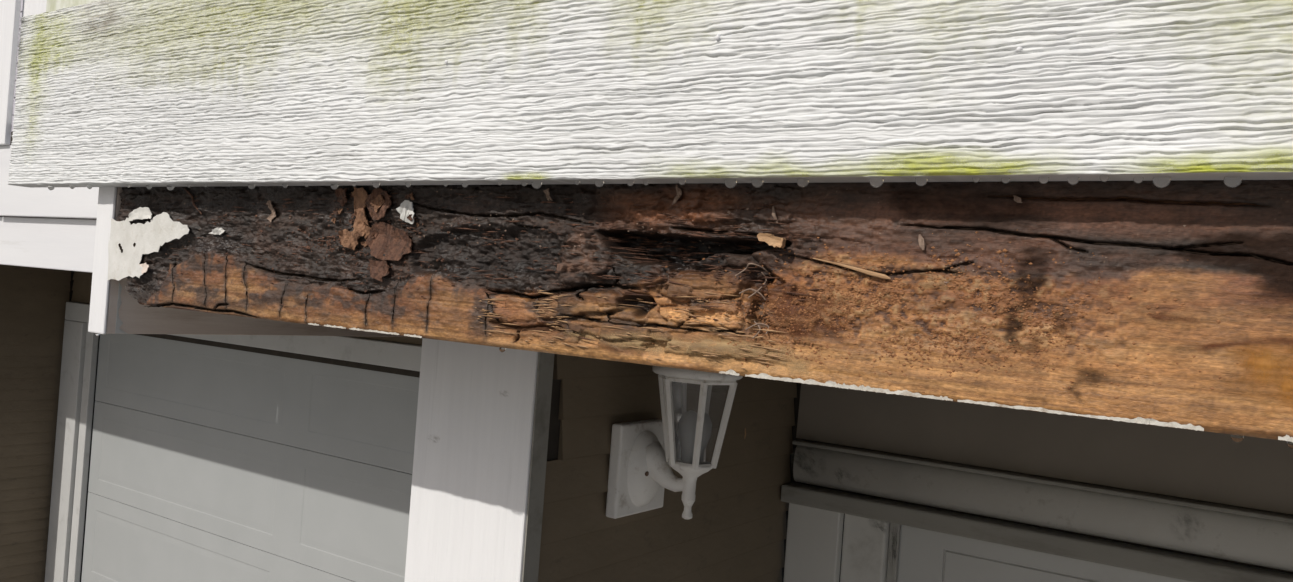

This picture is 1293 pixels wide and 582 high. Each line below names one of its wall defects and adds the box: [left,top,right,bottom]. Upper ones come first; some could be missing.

damp [379,0,439,55]
damp [877,156,1020,176]
damp [1163,156,1293,173]
peeling [266,200,276,222]
crack [995,196,1269,207]
peeling [108,207,190,281]
peeling [332,186,420,282]
crack [671,227,757,236]
crack [905,224,1293,264]
crack [790,255,973,275]
peeling [308,323,422,338]
damp [1203,338,1293,403]